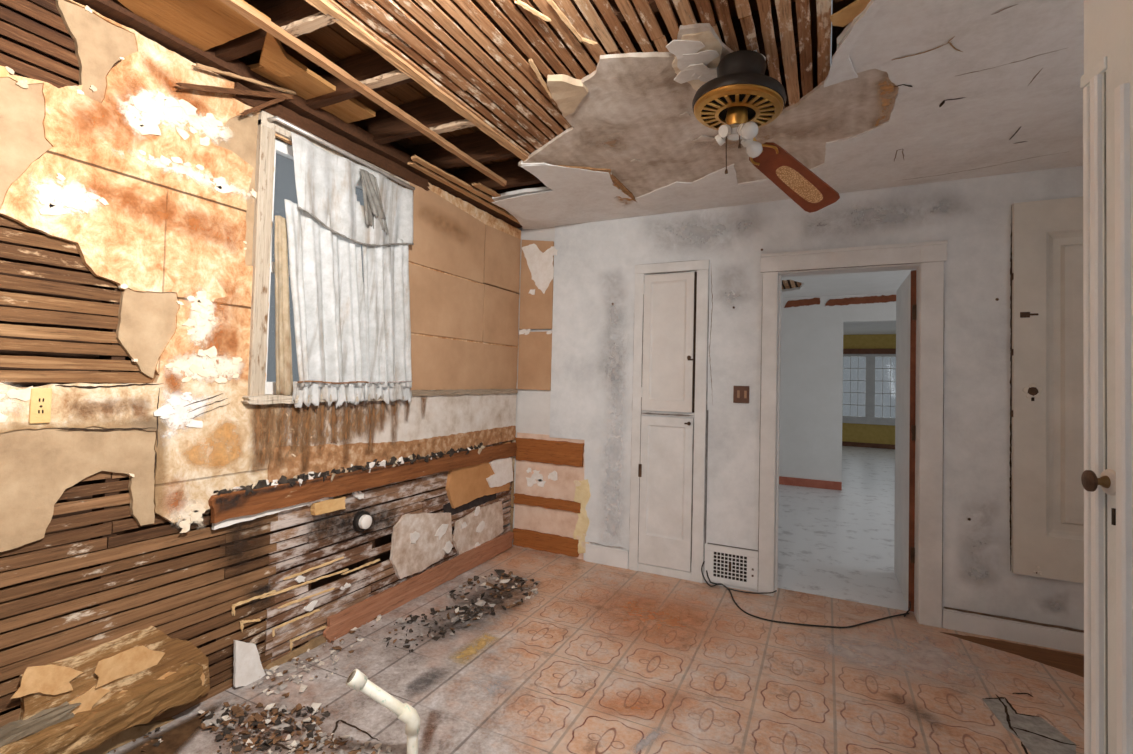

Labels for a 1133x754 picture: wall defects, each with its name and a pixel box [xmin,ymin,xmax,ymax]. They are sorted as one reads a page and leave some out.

flaking render [326,0,899,222]
flaking render [0,0,591,728]
spalling [982,695,1079,754]